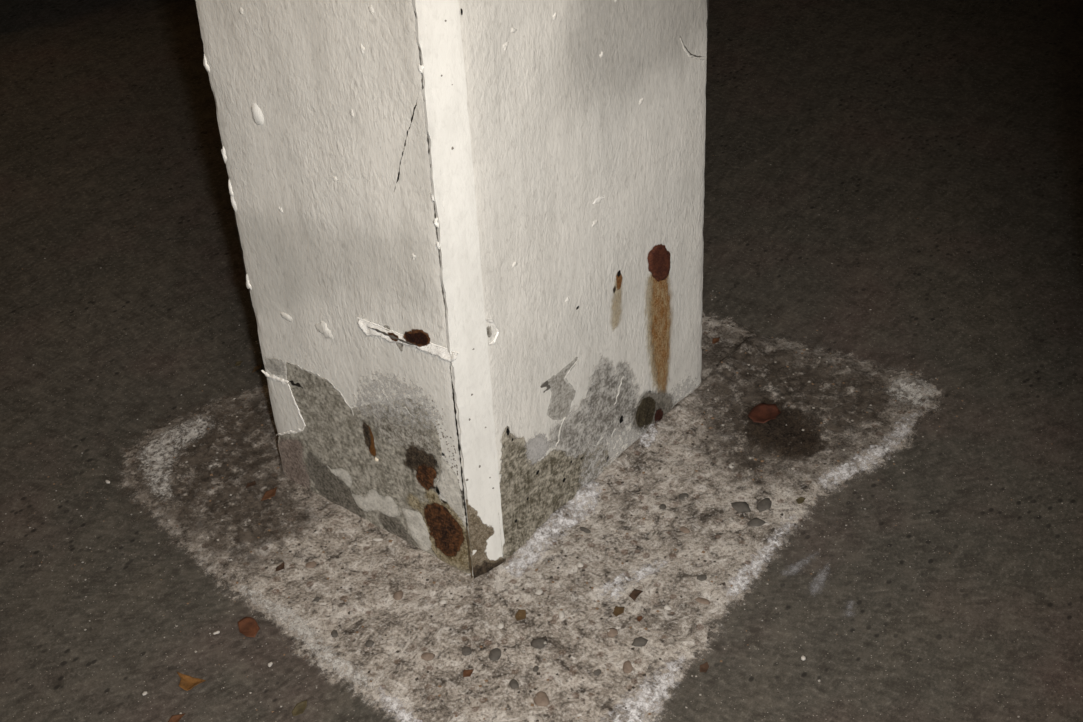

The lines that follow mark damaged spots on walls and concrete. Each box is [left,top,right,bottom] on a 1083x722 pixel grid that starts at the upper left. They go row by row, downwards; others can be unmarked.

corrosion [612,270,622,329]
corrosion [632,244,673,431]
leakage [139,417,214,498]
peeling [277,362,472,574]
corrosion [404,445,471,570]
leakage [466,424,657,579]
peeling [499,357,637,560]
leakage [728,517,794,595]
leakage [743,400,825,457]
leakage [820,378,935,487]
leakage [379,688,422,722]
leakage [604,658,684,722]